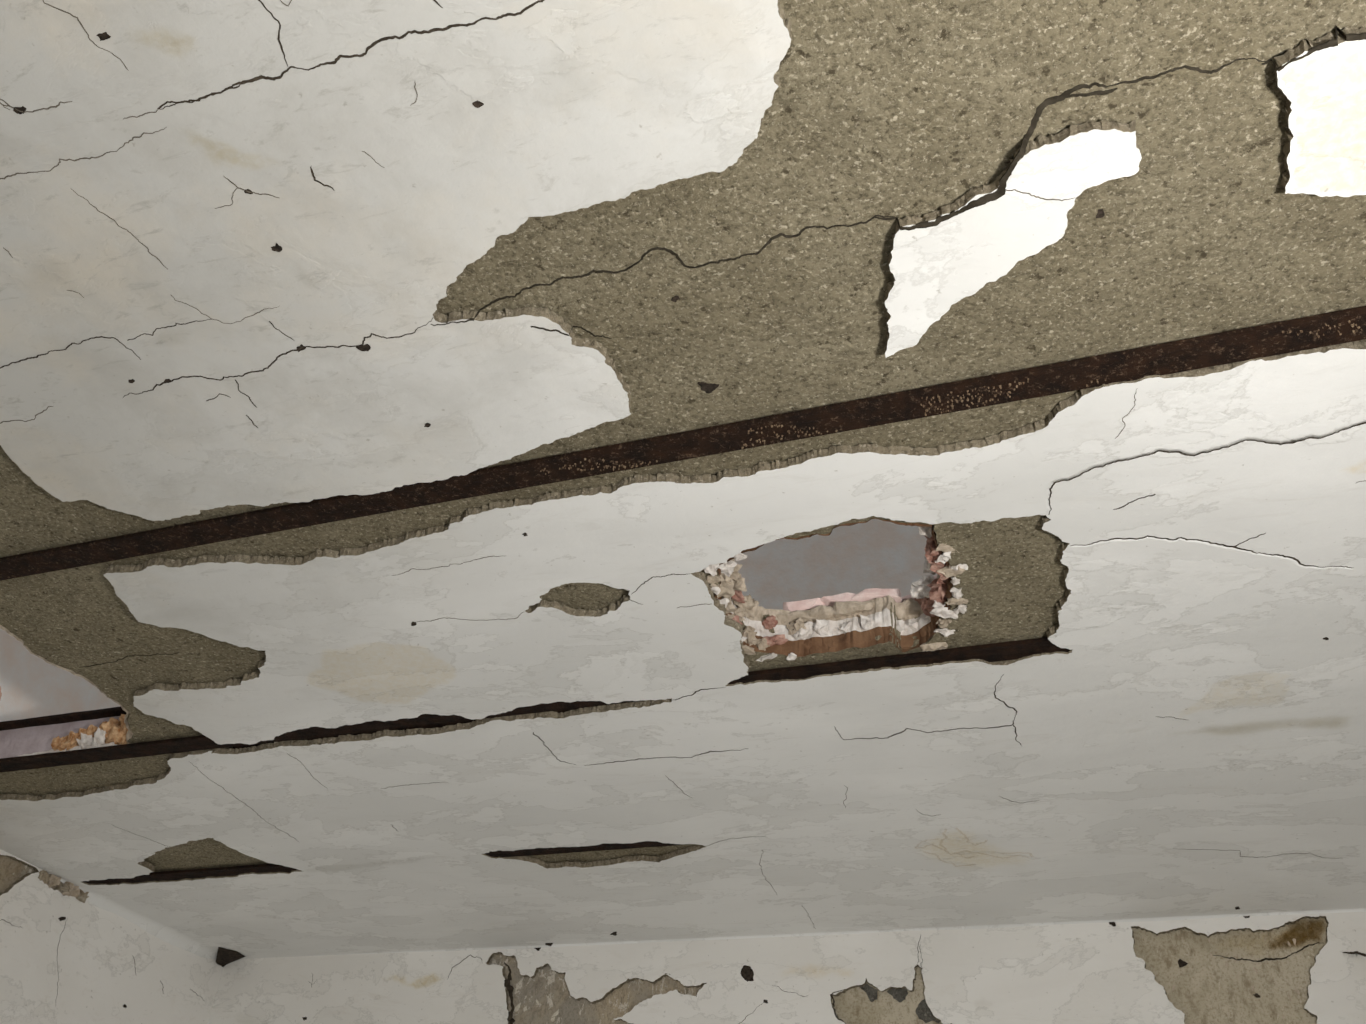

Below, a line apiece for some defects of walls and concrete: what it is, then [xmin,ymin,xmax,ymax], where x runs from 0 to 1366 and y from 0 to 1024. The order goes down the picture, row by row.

crack [0,0,1366,428]
flaking render [437,0,1366,470]
crack [1045,388,1366,515]
crack [1071,494,1353,570]
flaking render [0,390,1081,796]
flaking render [144,838,272,872]
spalling [216,947,246,967]
flaking render [488,943,704,1024]
spalling [741,965,754,982]
flaking render [832,966,942,1024]
flaking render [1109,906,1328,1024]
crack [1213,942,1366,967]